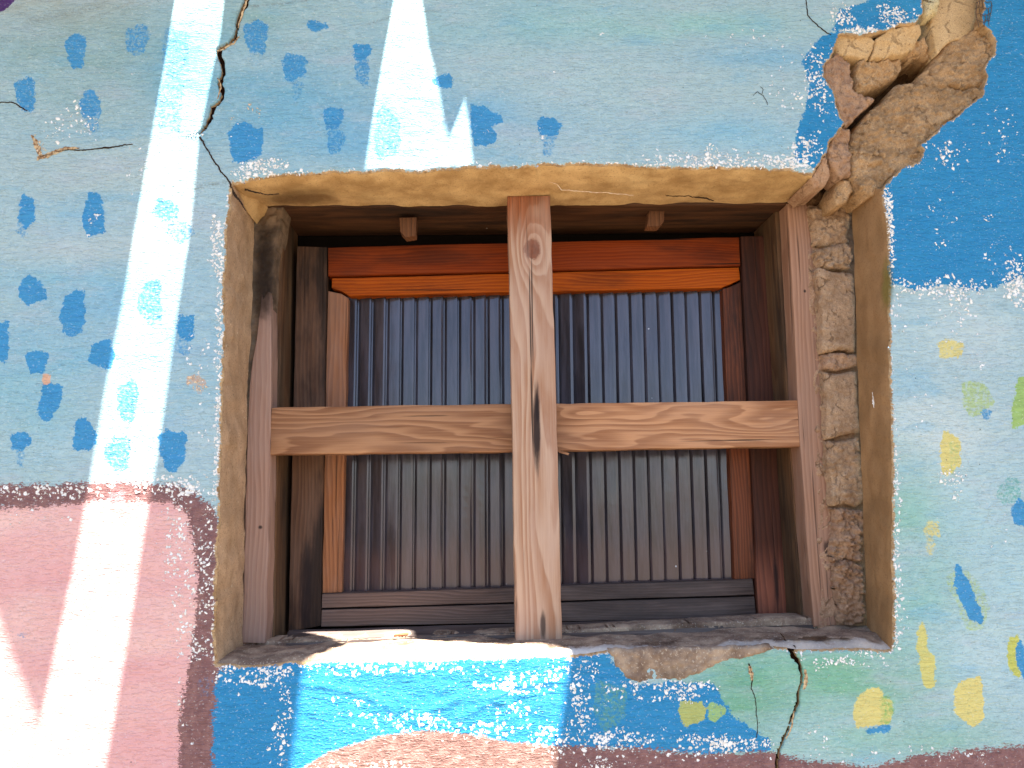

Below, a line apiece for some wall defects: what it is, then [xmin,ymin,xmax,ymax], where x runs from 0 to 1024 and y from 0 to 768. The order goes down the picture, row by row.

crack [0,101,132,161]
crack [199,0,249,188]
flaking render [642,0,1024,628]
peeling [814,517,900,672]
peeling [607,643,773,704]
crack [748,633,808,768]